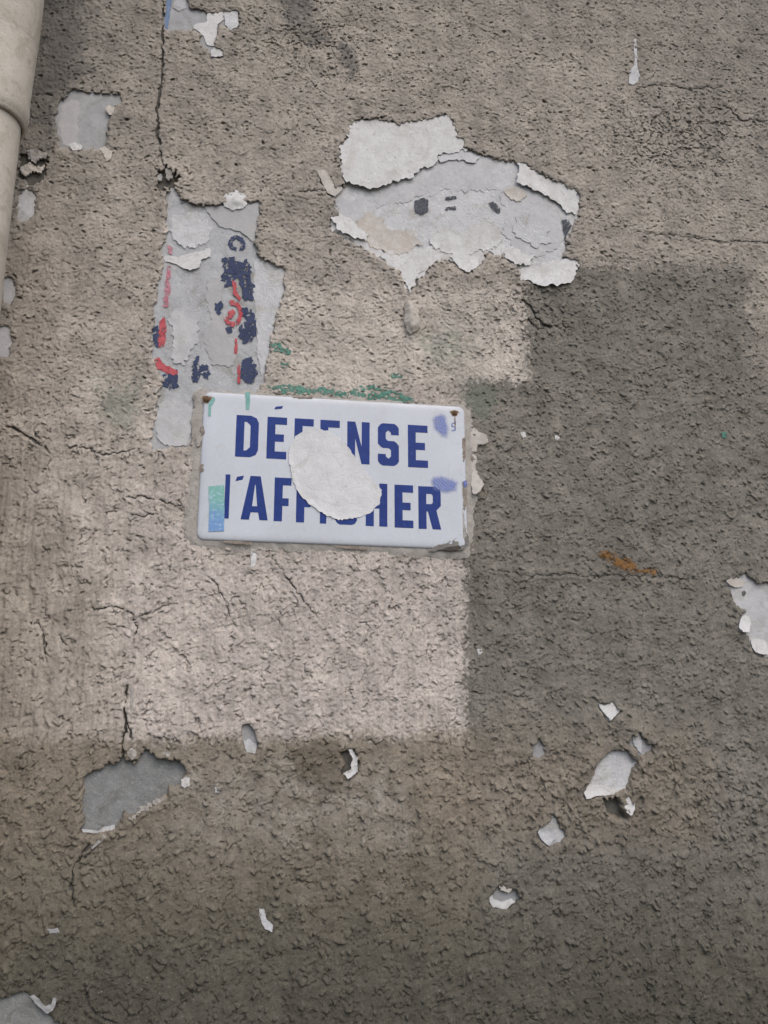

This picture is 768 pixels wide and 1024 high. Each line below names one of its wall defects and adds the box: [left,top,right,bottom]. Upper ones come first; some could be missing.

peeling [163,0,240,59]
crack [155,0,165,165]
peeling [54,90,121,162]
peeling [317,114,580,293]
rust [599,551,659,575]
peeling [723,574,768,658]
crack [121,685,132,755]
flaking render [81,748,190,849]
flaking render [537,815,565,847]
peeling [583,732,652,816]
crack [69,845,95,906]
flaking render [0,991,60,1024]